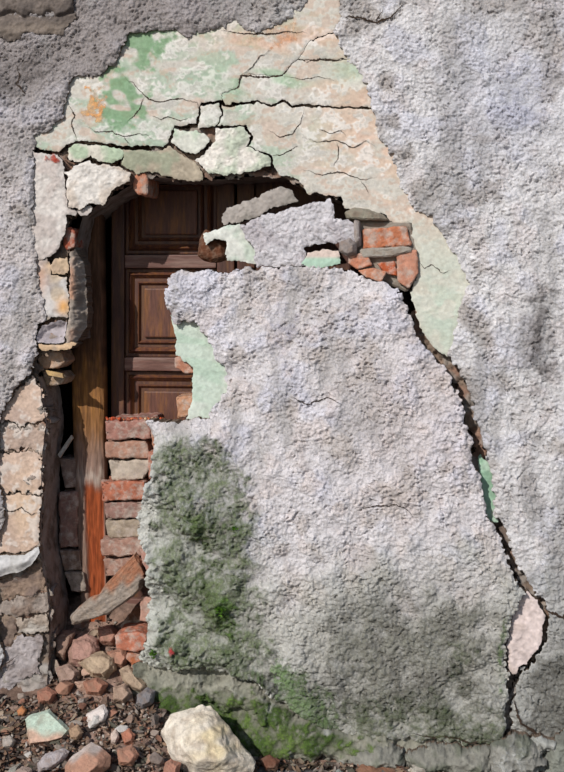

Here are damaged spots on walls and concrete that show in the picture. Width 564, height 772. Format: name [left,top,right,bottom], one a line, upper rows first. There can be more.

crack [224,28,303,36]
crack [333,3,403,34]
crack [38,54,373,188]
flaking render [31,0,470,357]
crack [399,289,416,326]
crack [451,380,487,455]
spalling [0,376,54,690]
leakage [323,590,506,746]
crack [410,733,486,744]
crack [509,667,539,736]
flaking render [506,588,545,674]